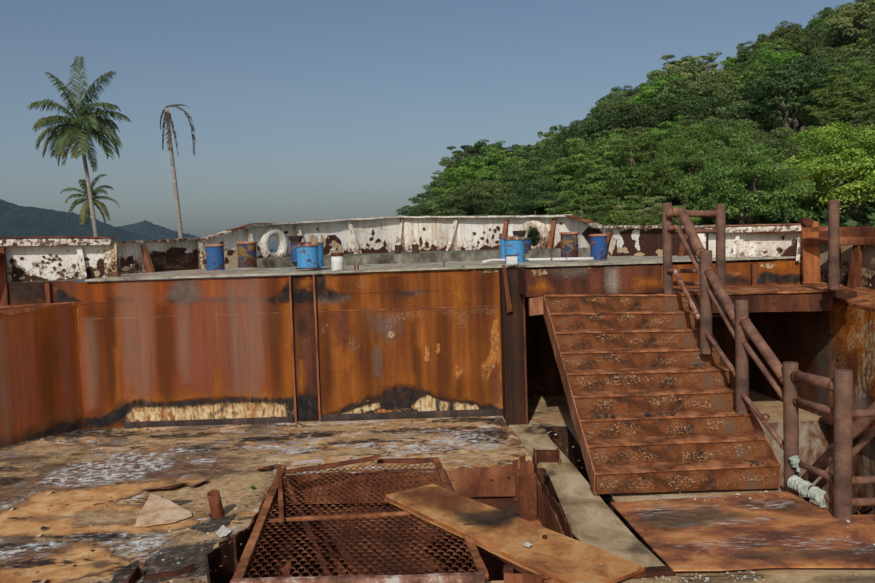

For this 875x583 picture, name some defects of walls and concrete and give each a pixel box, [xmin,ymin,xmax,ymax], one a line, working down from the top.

peeling [9,254,105,283]
peeling [120,256,140,273]
peeling [150,247,199,272]
peeling [220,241,238,268]
peeling [310,227,349,255]
peeling [361,229,390,254]
peeling [419,227,448,252]
peeling [473,226,502,250]
rust [115,308,314,405]
water stain [0,417,507,496]